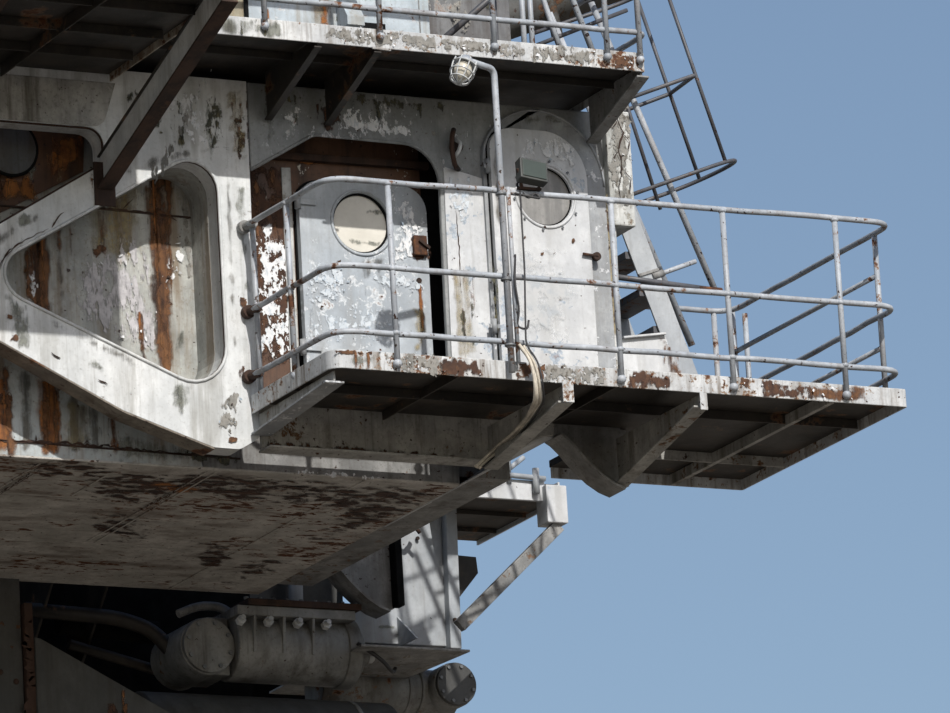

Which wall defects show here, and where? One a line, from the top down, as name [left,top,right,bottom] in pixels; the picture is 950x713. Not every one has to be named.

peeling [441,39,600,66]
crack [612,119,632,207]
peeling [75,236,157,350]
corrosion [137,179,173,371]
corrosion [231,91,289,363]
peeling [256,224,295,357]
peeling [306,263,392,343]
peeling [391,194,423,263]
corrosion [334,276,482,377]
corrosion [628,346,681,388]
corrosion [762,380,864,401]
corrosion [21,381,433,542]